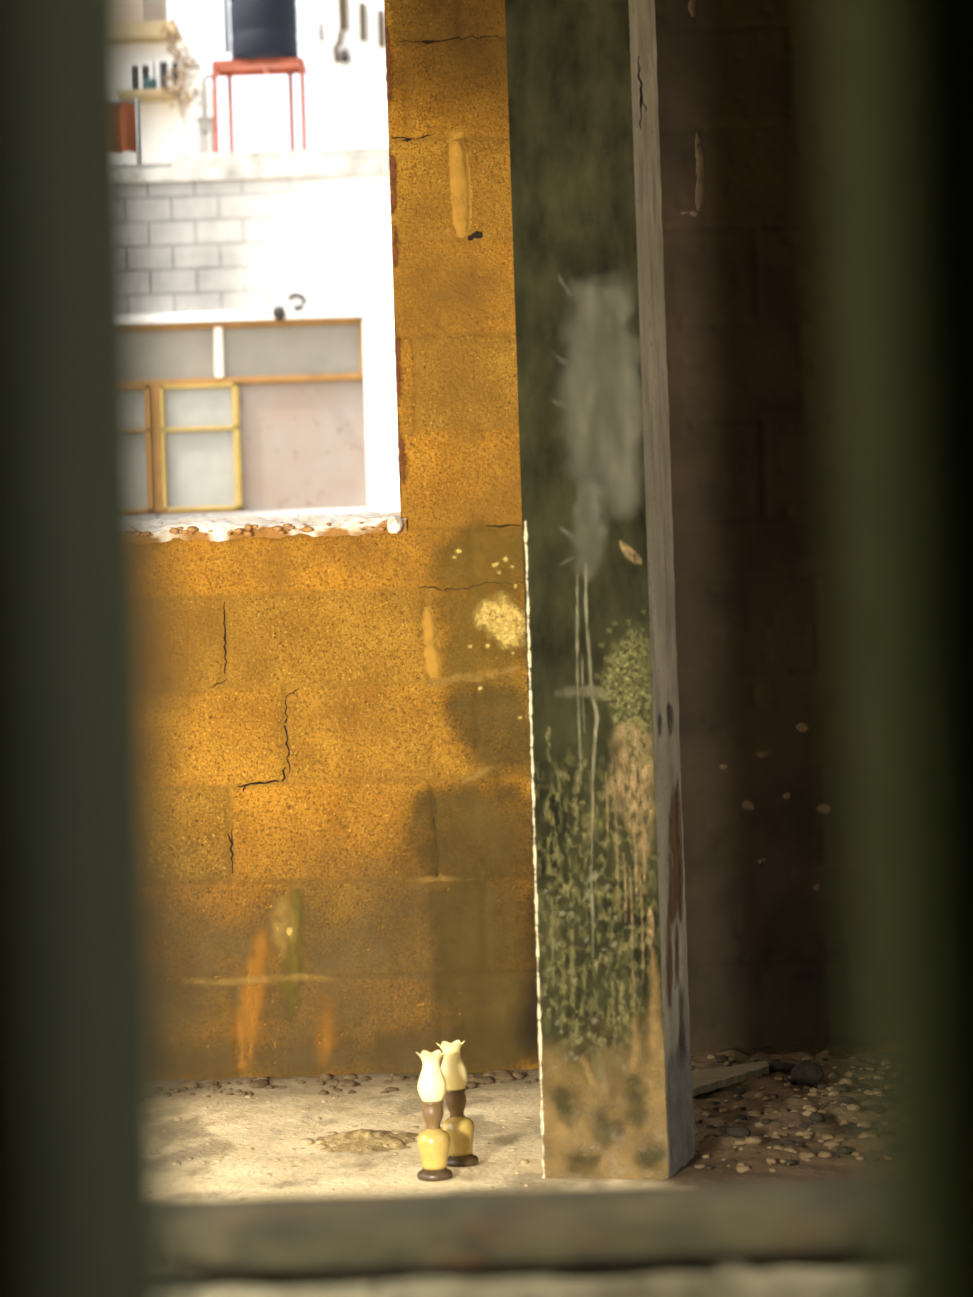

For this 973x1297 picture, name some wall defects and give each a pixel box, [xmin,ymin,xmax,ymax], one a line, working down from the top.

leakage [468,0,696,1173]
corrosion [236,935,265,1067]
leakage [167,874,518,1074]